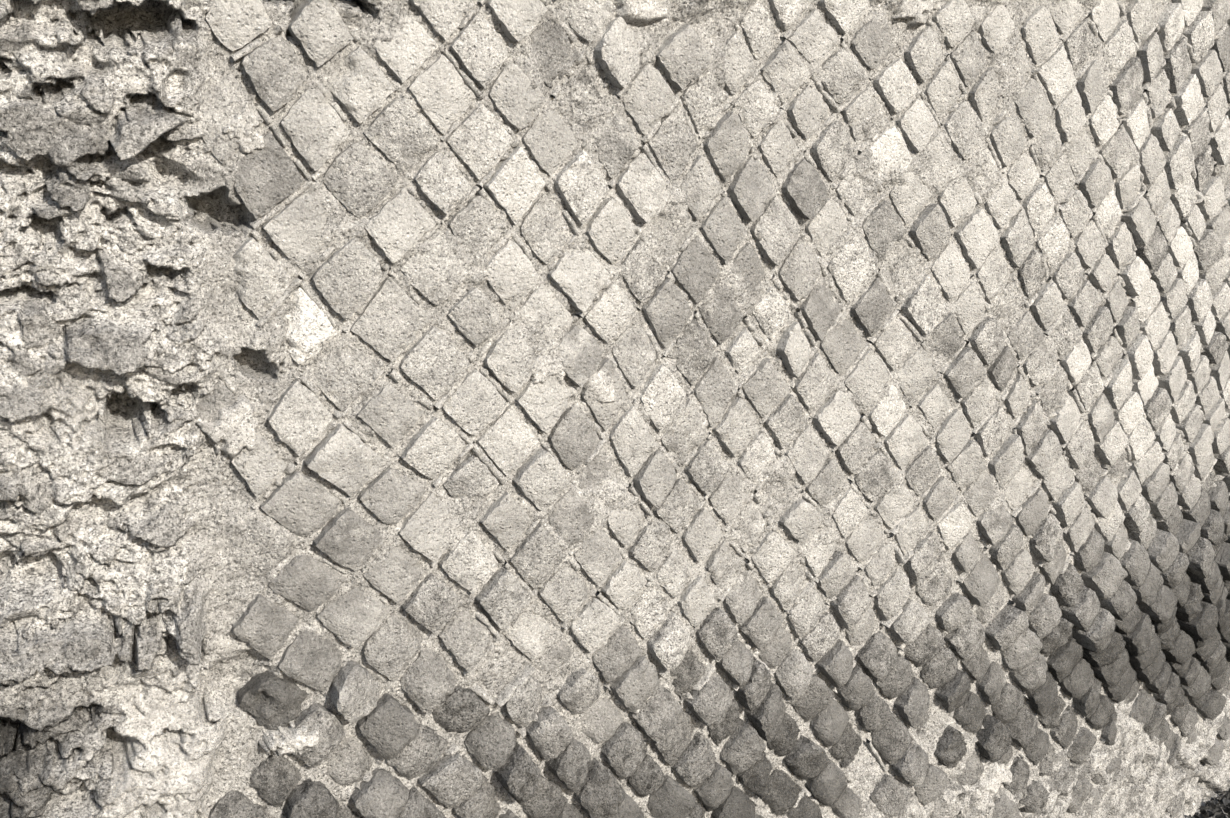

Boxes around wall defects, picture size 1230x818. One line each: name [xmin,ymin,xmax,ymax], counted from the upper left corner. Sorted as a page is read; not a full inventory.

spalling [350,0,385,16]
spalling [328,46,396,123]
spalling [567,69,600,131]
spalling [0,0,338,818]